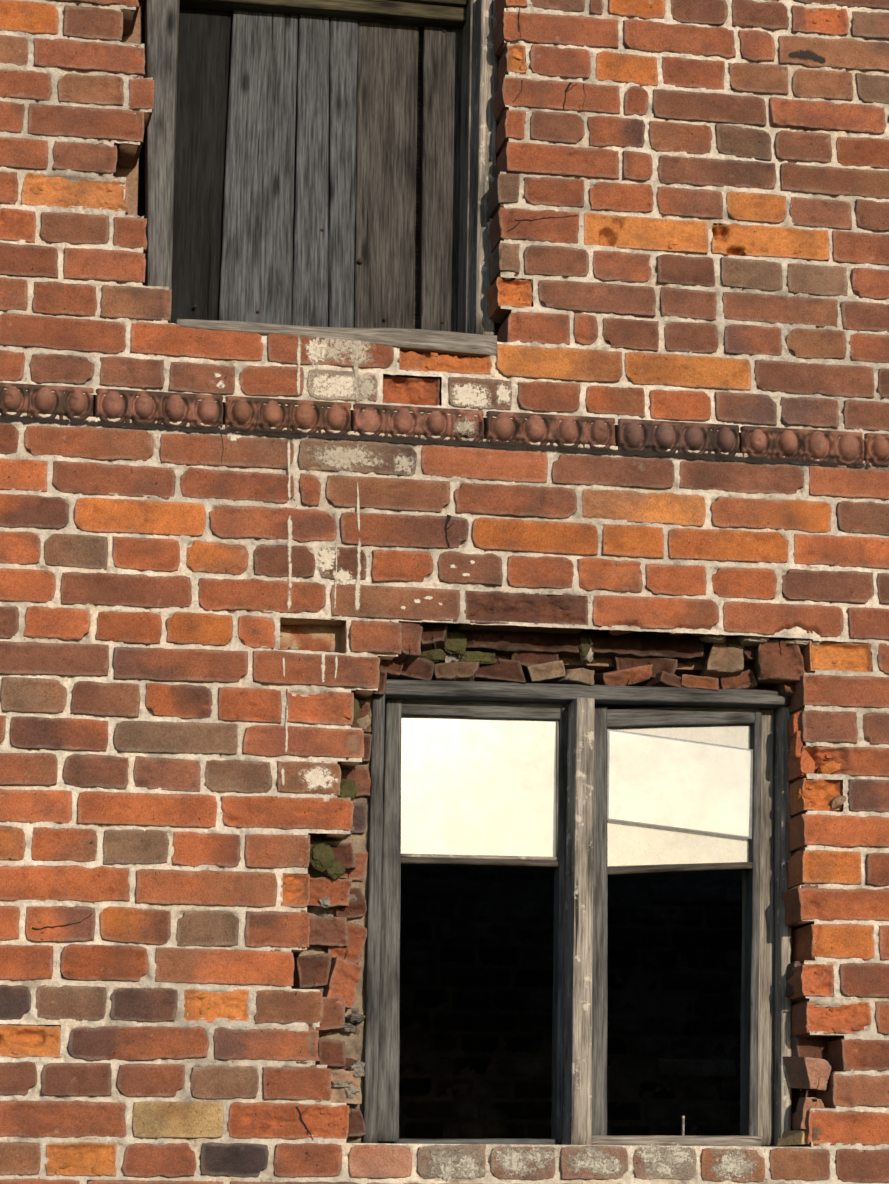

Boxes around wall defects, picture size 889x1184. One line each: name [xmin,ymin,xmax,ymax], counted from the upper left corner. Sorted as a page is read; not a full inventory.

spalling [0,172,129,243]
spalling [584,213,830,262]
water stain [297,337,378,401]
water stain [0,383,889,610]
spalling [787,712,889,817]
spalling [227,591,873,1147]
spalling [184,989,250,1023]
spalling [0,1024,62,1058]
spalling [45,1142,224,1184]